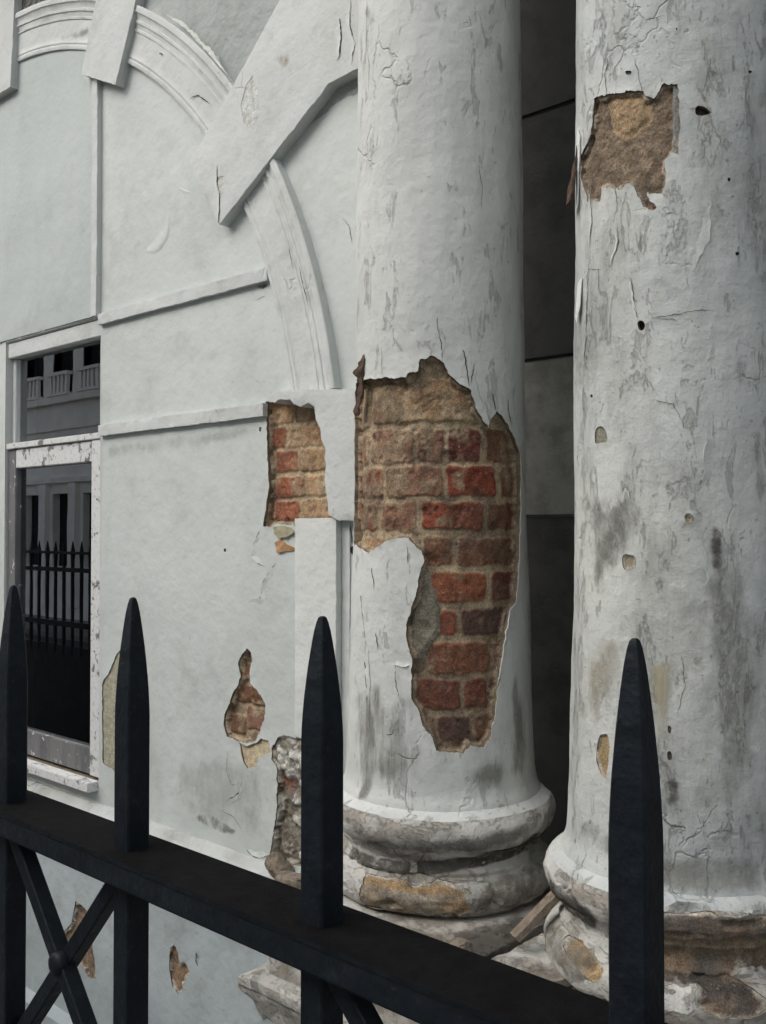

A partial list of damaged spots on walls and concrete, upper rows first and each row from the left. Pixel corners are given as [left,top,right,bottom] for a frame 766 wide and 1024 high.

crack [213,165,221,224]
peeling [566,85,680,237]
flaking render [260,402,334,553]
flaking render [353,355,518,753]
peeling [103,652,120,770]
flaking render [225,650,301,864]
peeling [597,734,610,779]
flaking render [65,901,87,941]
flaking render [80,944,96,978]
flaking render [170,945,199,994]
peeling [360,874,472,917]
peeling [664,908,766,1019]